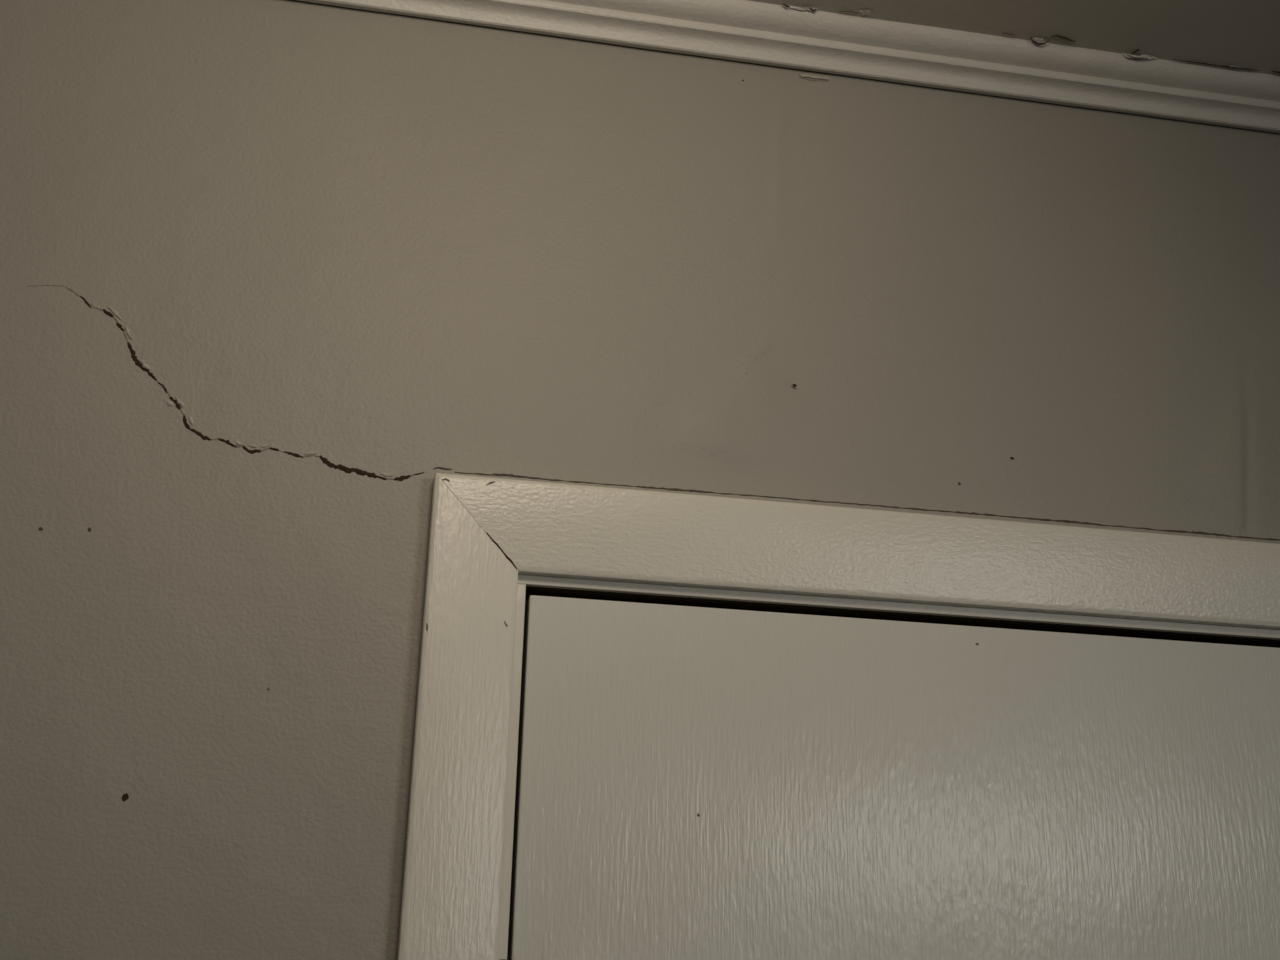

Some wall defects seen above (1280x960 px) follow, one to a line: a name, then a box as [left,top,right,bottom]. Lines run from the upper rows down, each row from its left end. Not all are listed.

crack [37,285,1280,569]